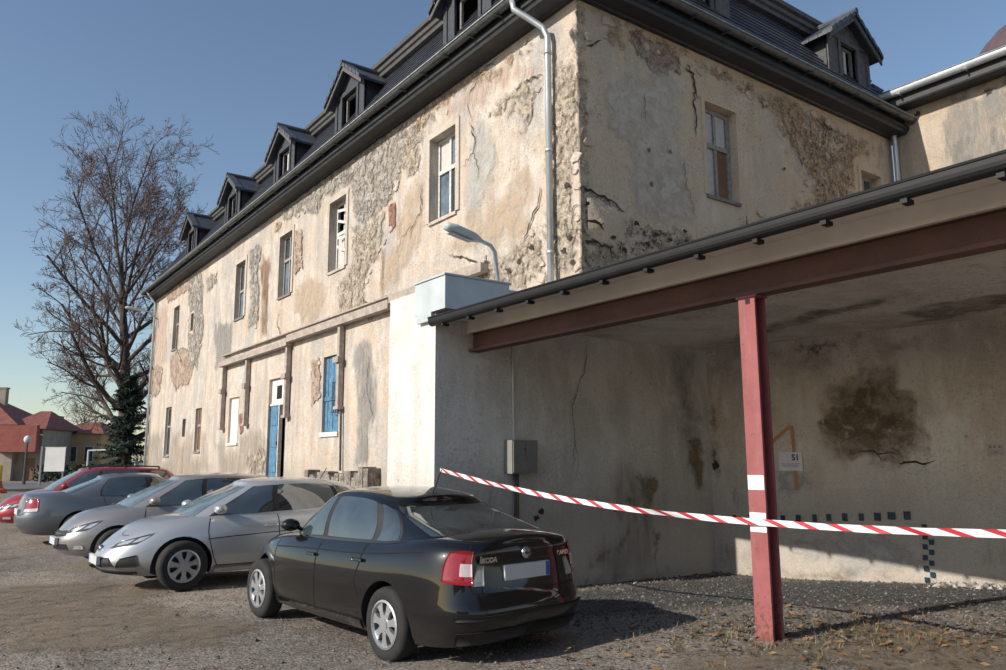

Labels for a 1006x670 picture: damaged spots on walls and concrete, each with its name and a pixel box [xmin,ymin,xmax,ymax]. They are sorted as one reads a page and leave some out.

spalling [337,40,530,322]
crack [465,58,496,180]
crack [524,186,624,256]
spalling [480,0,685,290]
crack [684,63,700,134]
spalling [694,59,870,210]
water stain [945,83,1006,164]
spalling [151,272,203,397]
water stain [689,439,703,488]
crack [857,450,935,465]